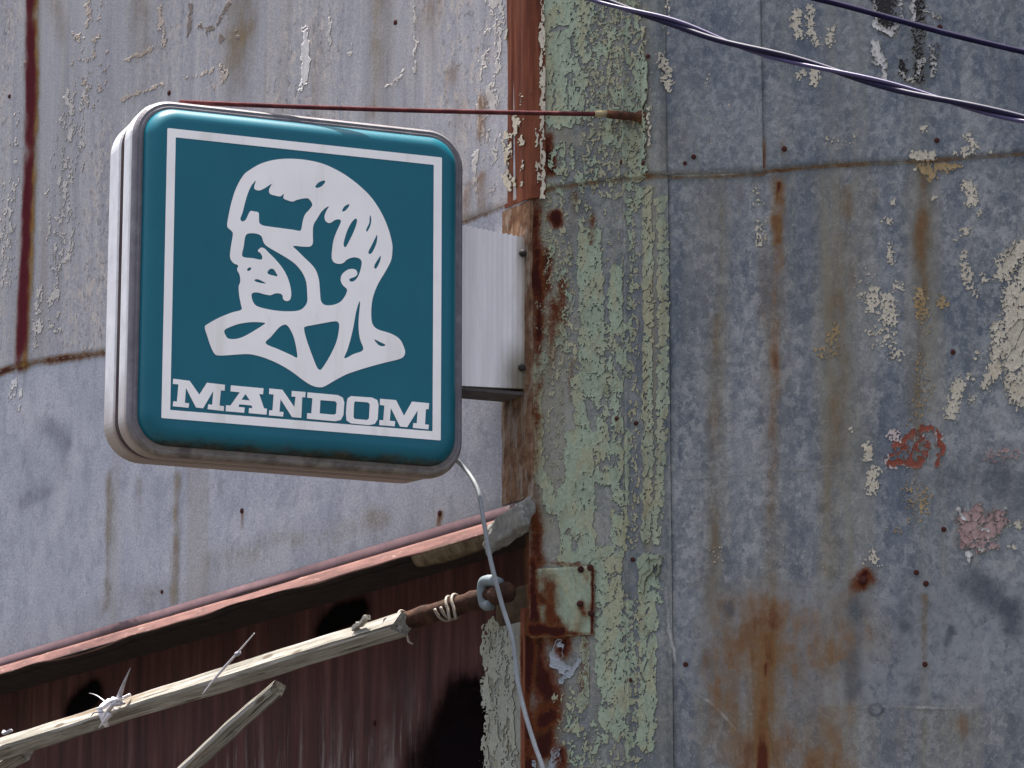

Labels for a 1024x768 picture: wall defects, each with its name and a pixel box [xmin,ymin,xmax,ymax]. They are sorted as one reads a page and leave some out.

peeling [298,25,311,93]
peeling [789,3,836,49]
peeling [870,0,942,85]
rust [0,0,39,376]
rust [545,133,557,191]
rust [43,351,105,364]
rust [530,199,566,366]
peeling [471,0,676,768]
peeling [849,130,1024,533]
peeling [953,502,1023,563]
rust [519,496,595,768]
rust [728,599,790,768]